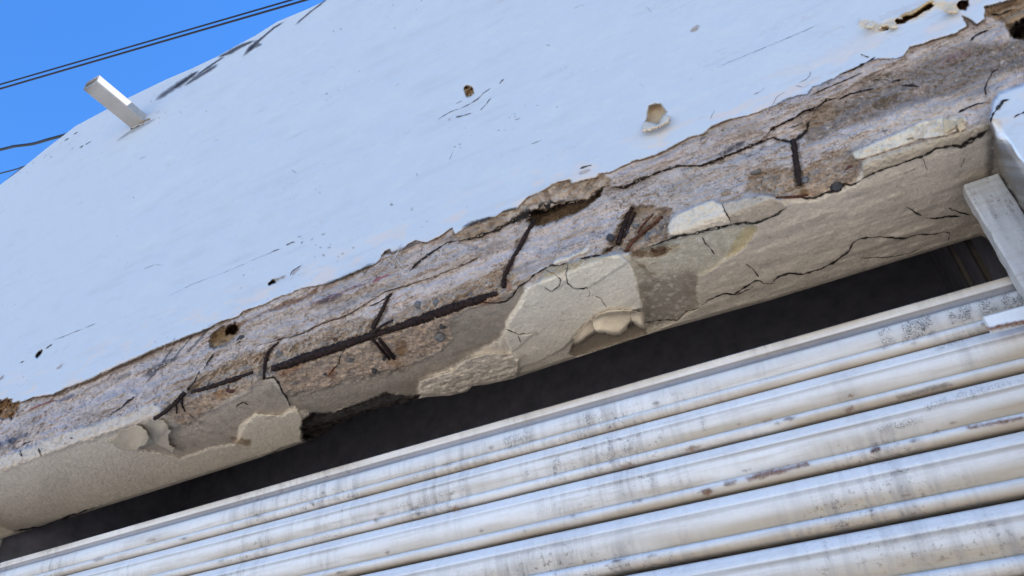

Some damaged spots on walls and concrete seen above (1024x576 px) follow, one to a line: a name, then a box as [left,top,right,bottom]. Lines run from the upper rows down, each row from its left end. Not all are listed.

peeling [865,0,933,31]
peeling [945,1,968,14]
crack [615,54,919,189]
spalling [602,116,990,255]
crack [652,69,1024,254]
crack [258,200,582,346]
spalling [109,50,912,459]
crack [482,245,616,306]
crack [646,207,970,323]
spalling [0,398,20,420]